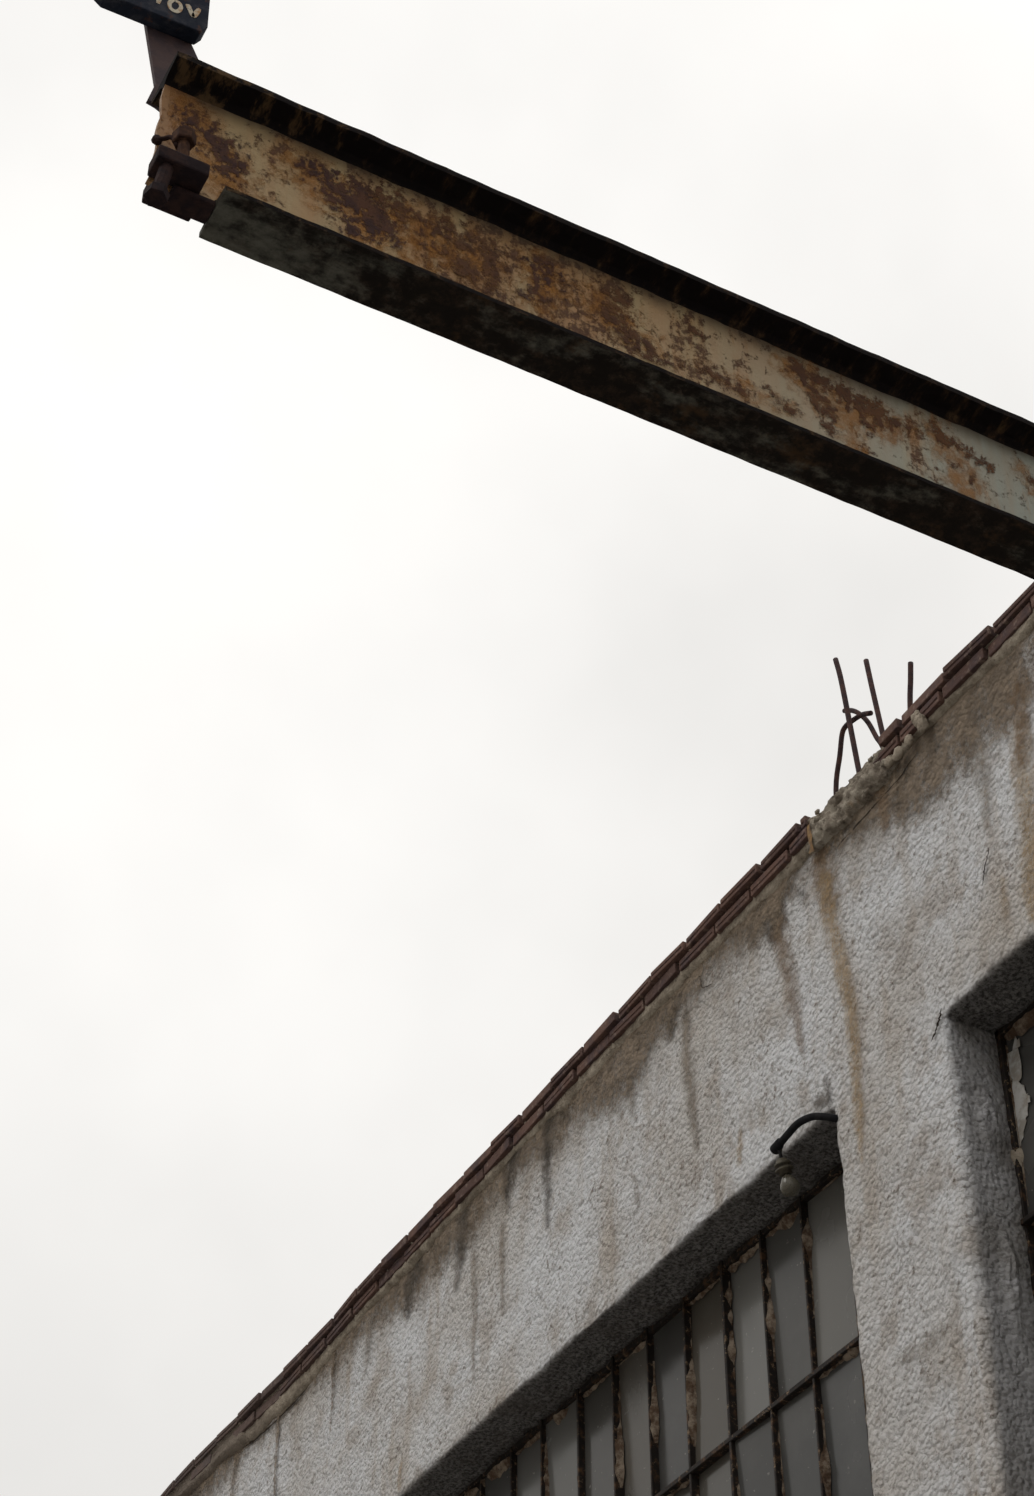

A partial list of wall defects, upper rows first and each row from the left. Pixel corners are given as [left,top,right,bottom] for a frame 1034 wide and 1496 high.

corrosion [168,96,253,195]
corrosion [281,152,682,372]
corrosion [700,356,996,499]
spalling [807,710,929,855]
water stain [188,627,1034,1496]
peeling [1007,1036,1031,1148]